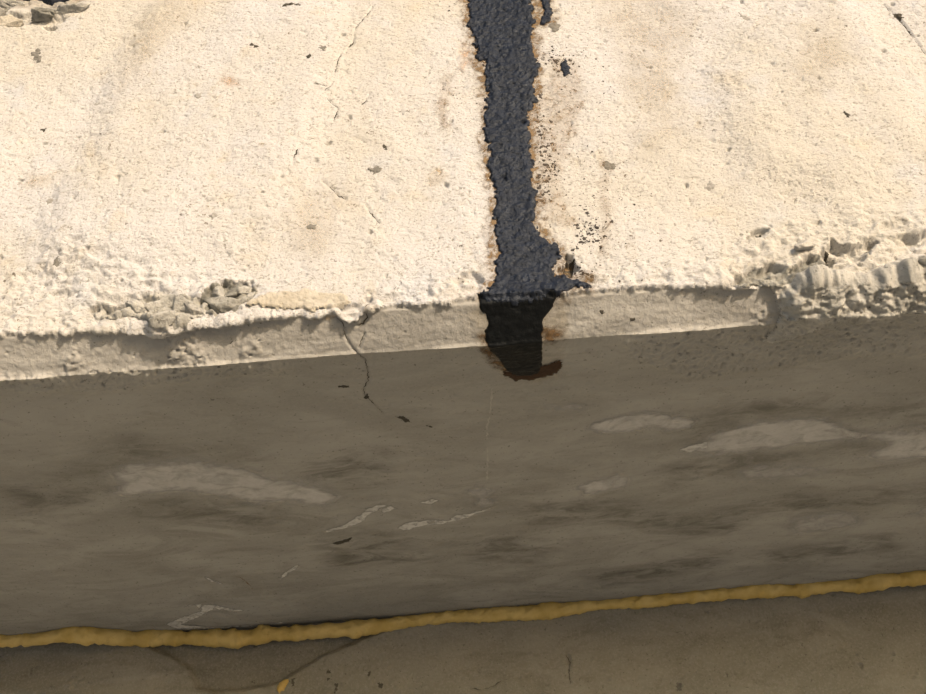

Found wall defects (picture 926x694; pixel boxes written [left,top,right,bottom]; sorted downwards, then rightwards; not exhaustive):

crack [313,6,373,119]
spalling [89,278,351,332]
crack [338,304,380,410]
spalling [735,239,833,288]